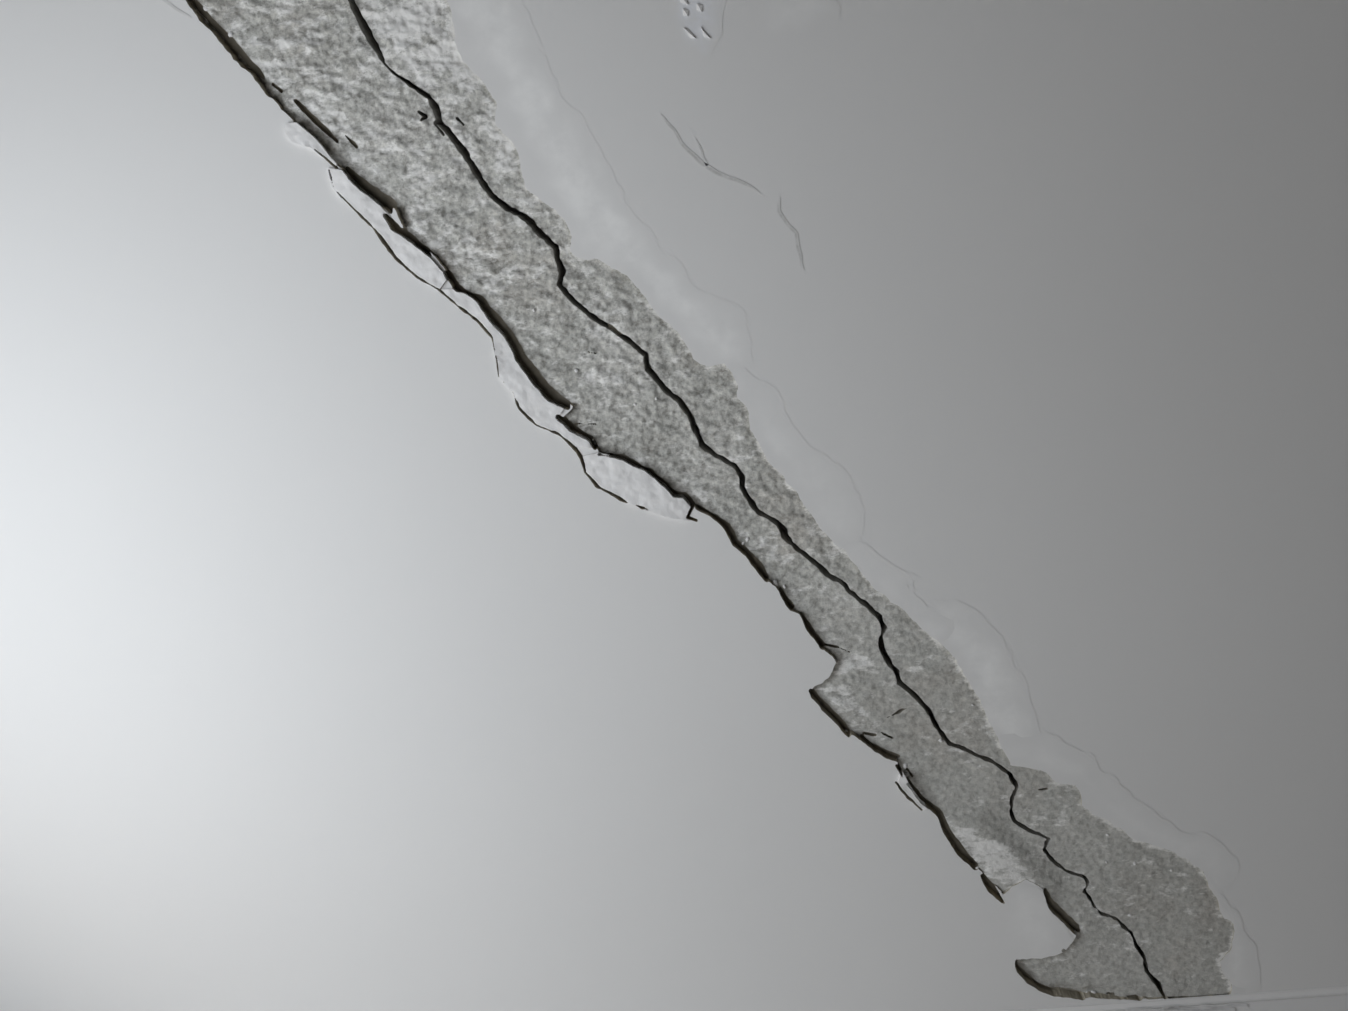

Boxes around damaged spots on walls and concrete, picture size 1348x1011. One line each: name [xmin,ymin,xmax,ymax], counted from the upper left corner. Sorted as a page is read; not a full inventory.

flaking render [186,0,1260,1006]
crack [348,0,1166,996]